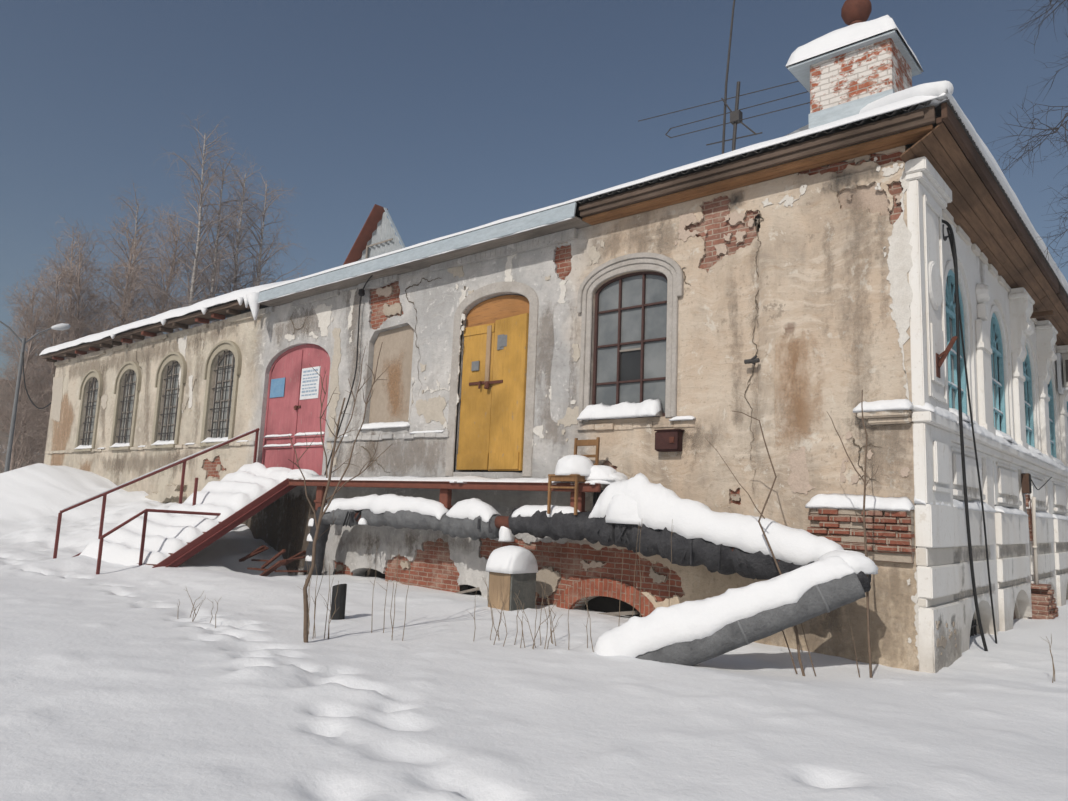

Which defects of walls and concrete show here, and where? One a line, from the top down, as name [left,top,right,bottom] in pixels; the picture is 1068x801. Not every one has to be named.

flaking render [370,281,403,329]
peeling [504,254,517,282]
flaking render [554,241,572,304]
flaking render [675,152,913,400]
peeling [309,288,357,467]
crack [744,210,764,490]
flaking render [203,456,227,479]
crack [853,438,882,482]
flaking render [385,538,460,593]
flaking render [480,537,685,606]